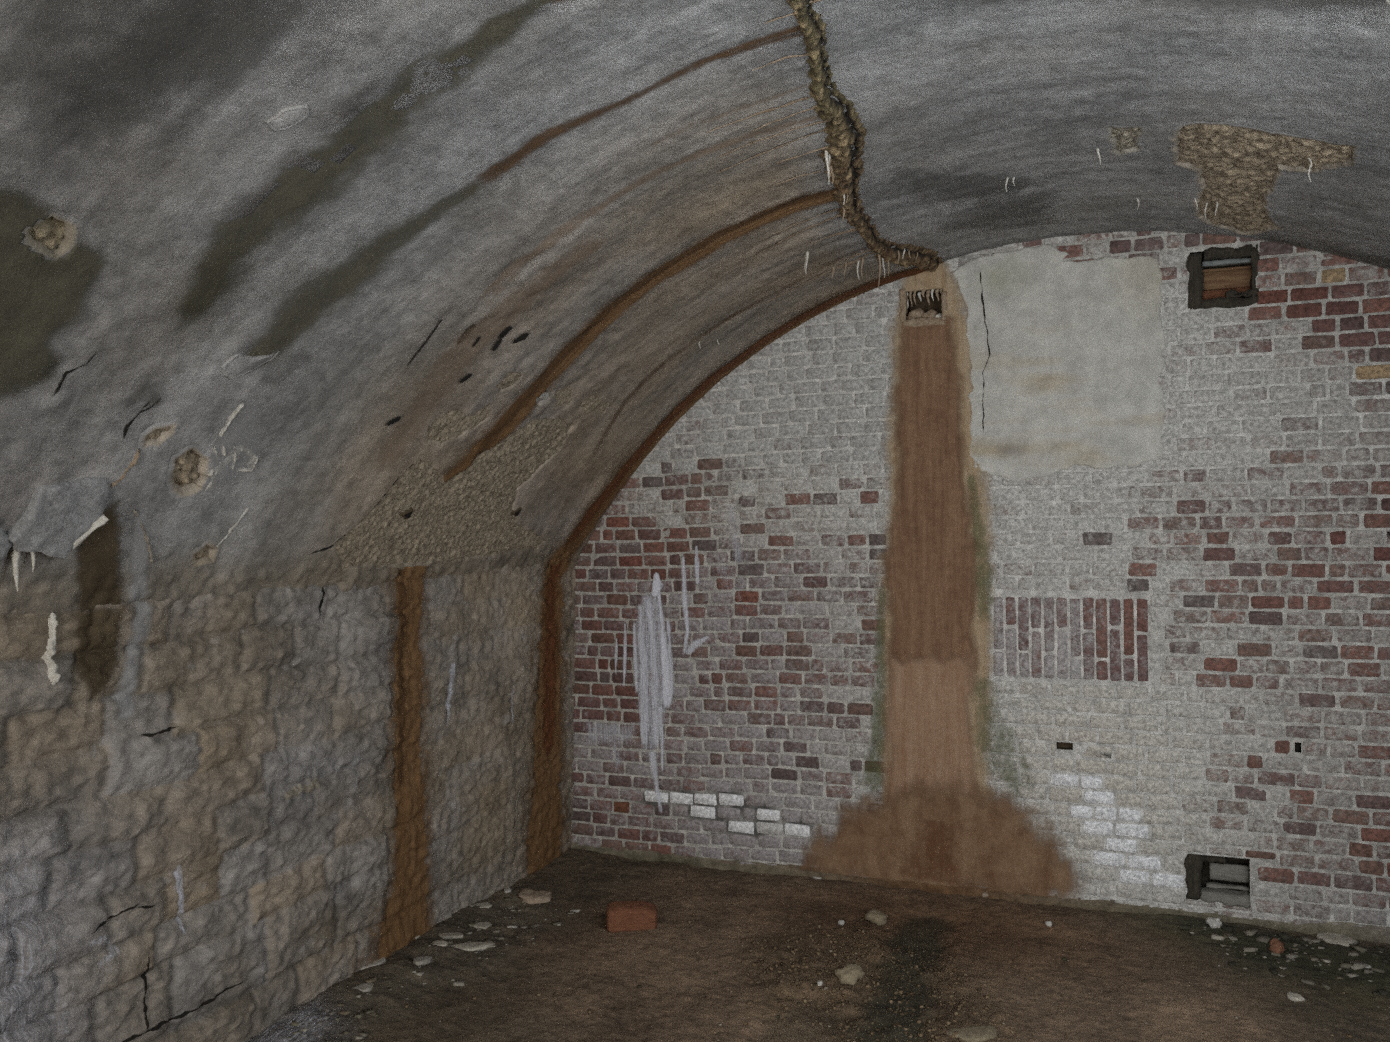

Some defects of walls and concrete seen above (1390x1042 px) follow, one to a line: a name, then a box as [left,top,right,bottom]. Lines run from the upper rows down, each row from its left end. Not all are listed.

flaking render [21,208,84,261]
corrosion [443,189,838,482]
crack [707,0,944,303]
crack [980,271,991,432]
flaking render [1166,121,1363,236]
flaking render [0,477,109,591]
flaking render [138,419,214,500]
corrosion [369,566,434,963]
flaking render [331,368,578,576]
efflorescence [590,546,709,812]
corrosion [525,263,1075,898]